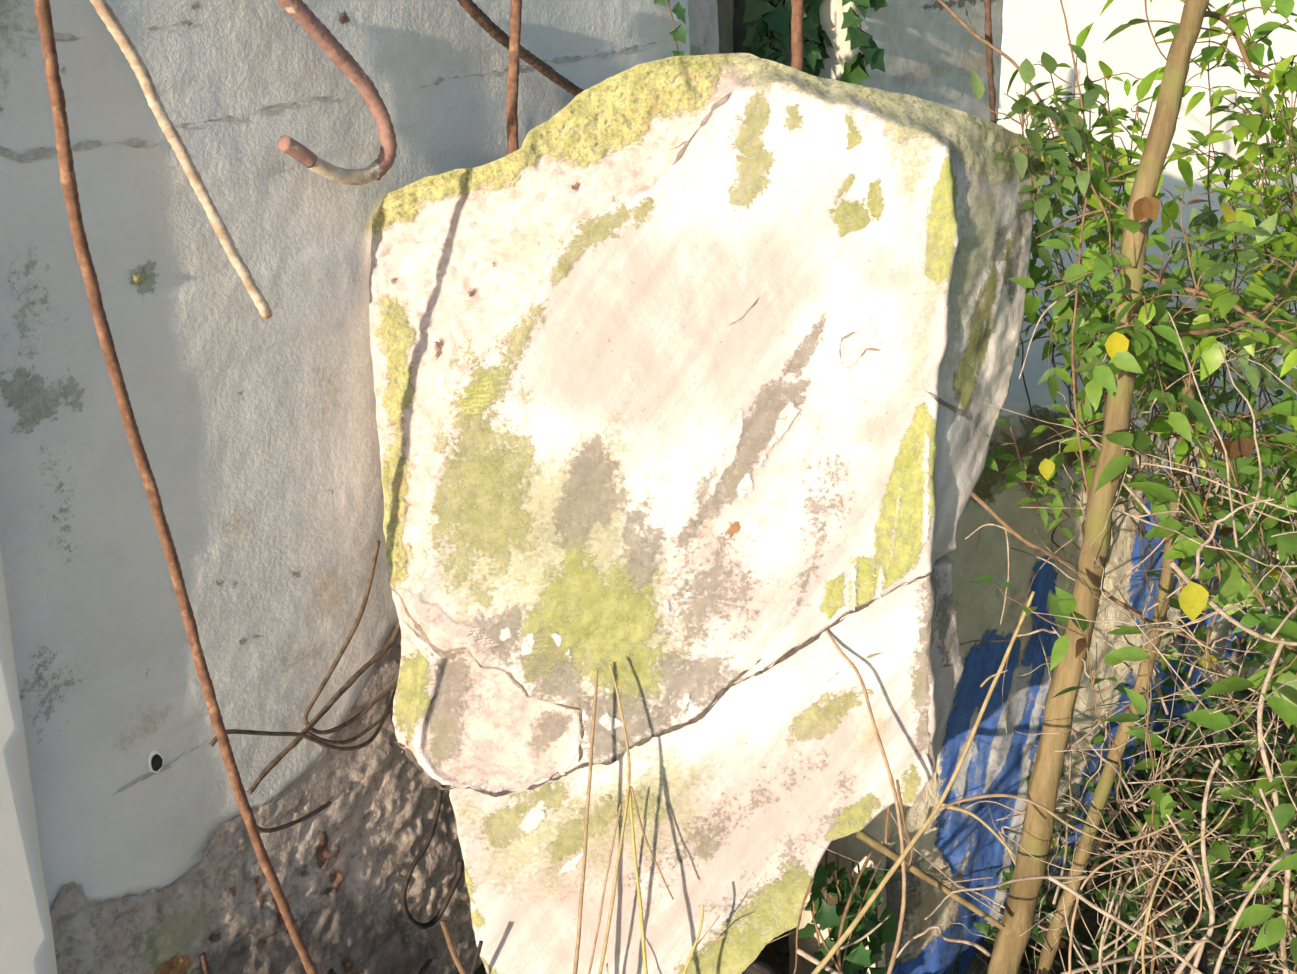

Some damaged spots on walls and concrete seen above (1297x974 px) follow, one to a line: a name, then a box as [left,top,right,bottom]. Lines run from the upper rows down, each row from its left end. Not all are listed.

spalling [34,0,584,974]
peeling [599,713,623,730]
crack [390,550,956,797]
peeling [677,693,691,710]
corrosion [301,830,345,890]
corrosion [253,876,289,933]